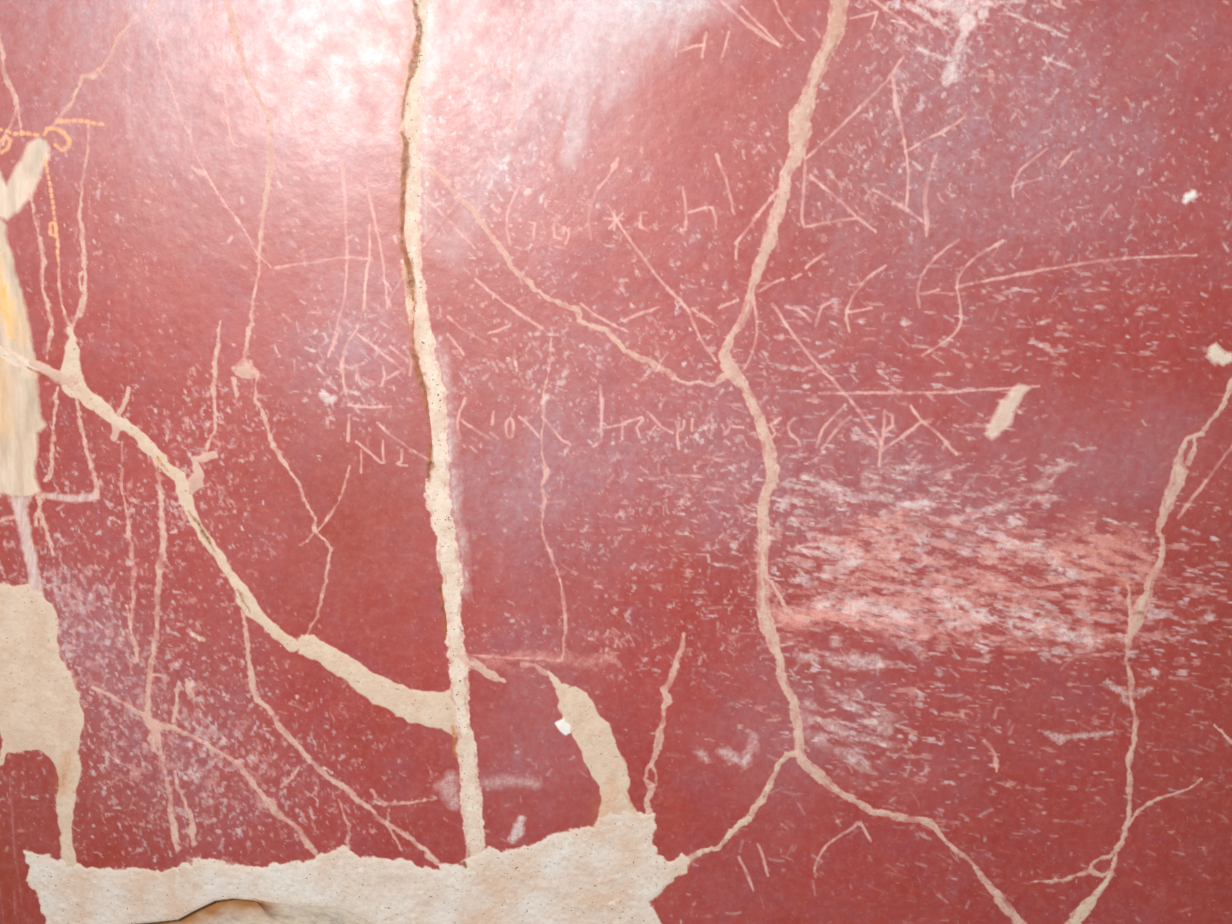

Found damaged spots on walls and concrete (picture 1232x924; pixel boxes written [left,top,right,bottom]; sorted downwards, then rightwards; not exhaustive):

crack [0,1,154,345]
crack [35,387,439,865]
flaking render [28,327,457,737]
crack [206,0,349,598]
flaking render [0,584,689,924]
crack [400,0,1026,924]
crack [1034,379,1232,924]